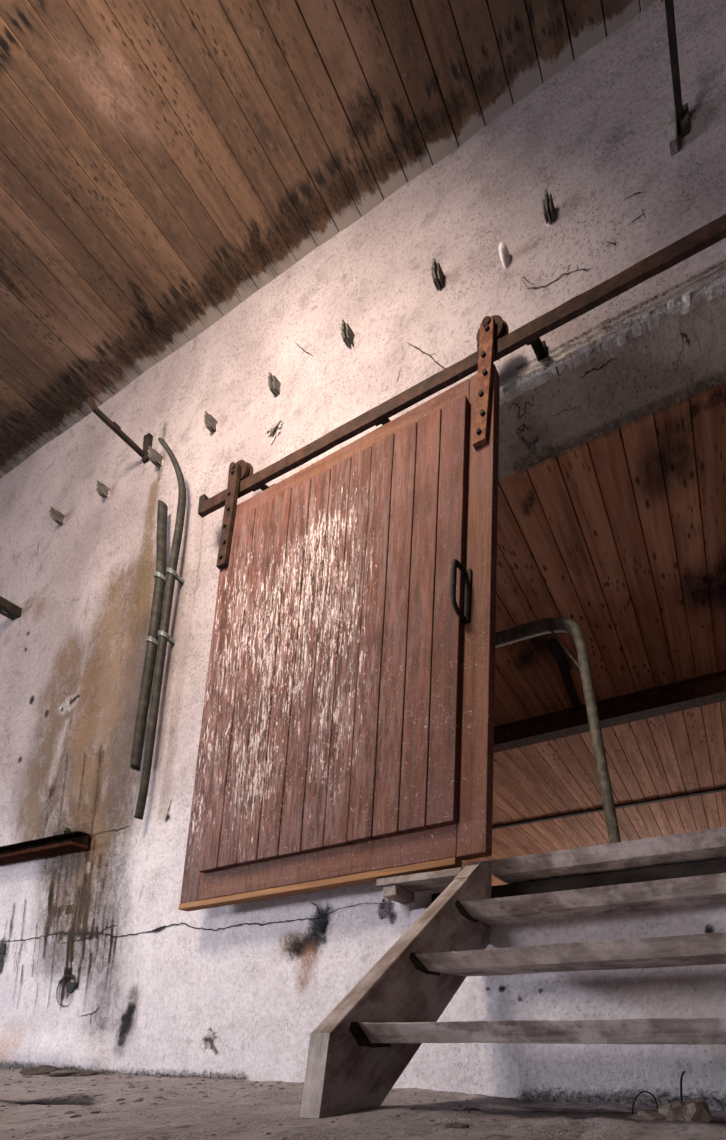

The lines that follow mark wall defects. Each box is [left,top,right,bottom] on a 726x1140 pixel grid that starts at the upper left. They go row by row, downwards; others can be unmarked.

water stain [0,70,490,478]
spalling [499,260,726,405]
water stain [4,470,168,1028]
crack [0,902,394,971]